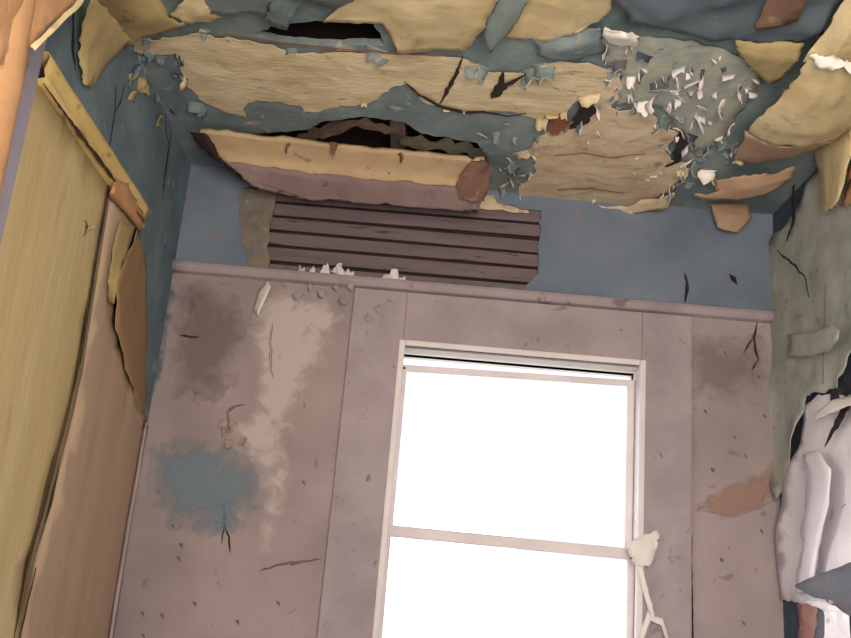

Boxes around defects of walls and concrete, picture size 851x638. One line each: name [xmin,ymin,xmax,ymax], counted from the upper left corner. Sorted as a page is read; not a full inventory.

flaking render [128,0,840,205]
crack [743,323,759,371]